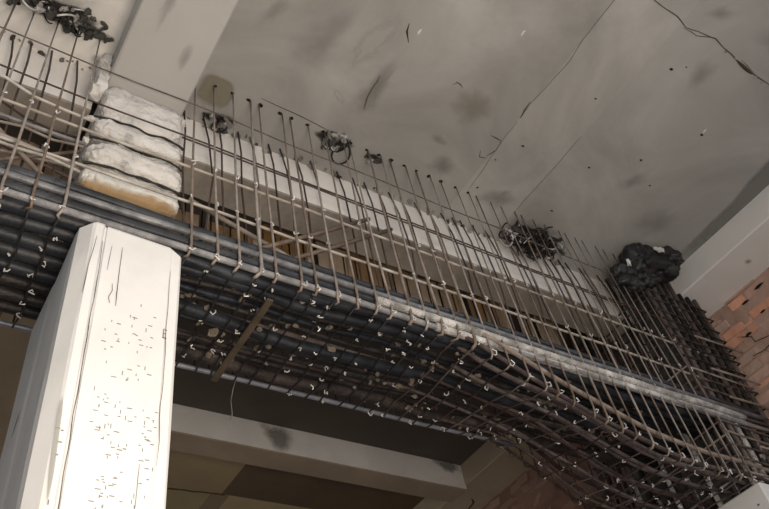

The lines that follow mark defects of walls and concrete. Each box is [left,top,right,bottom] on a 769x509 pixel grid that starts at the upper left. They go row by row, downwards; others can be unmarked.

spalling [6,0,114,43]
crack [654,0,769,85]
spalling [71,53,190,218]
spalling [202,112,383,195]
spalling [393,195,567,269]
water stain [268,430,288,448]